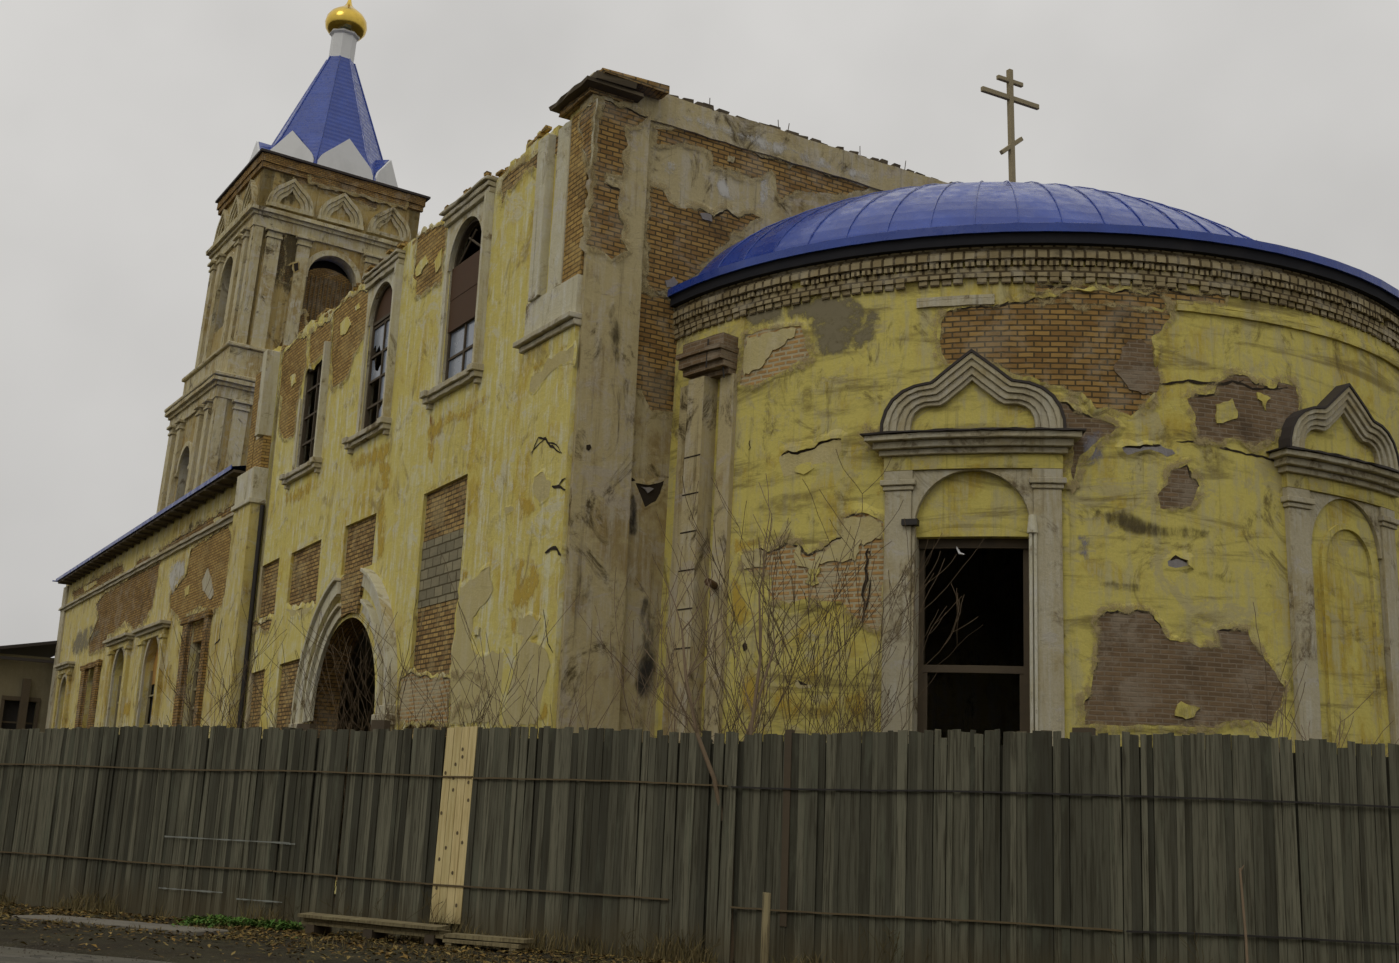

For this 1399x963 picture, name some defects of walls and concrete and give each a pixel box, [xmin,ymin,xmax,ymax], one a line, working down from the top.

flaking render [497,94,872,419]
flaking render [932,279,1303,517]
flaking render [72,499,235,658]
flaking render [734,503,885,638]
flaking render [1073,602,1290,734]